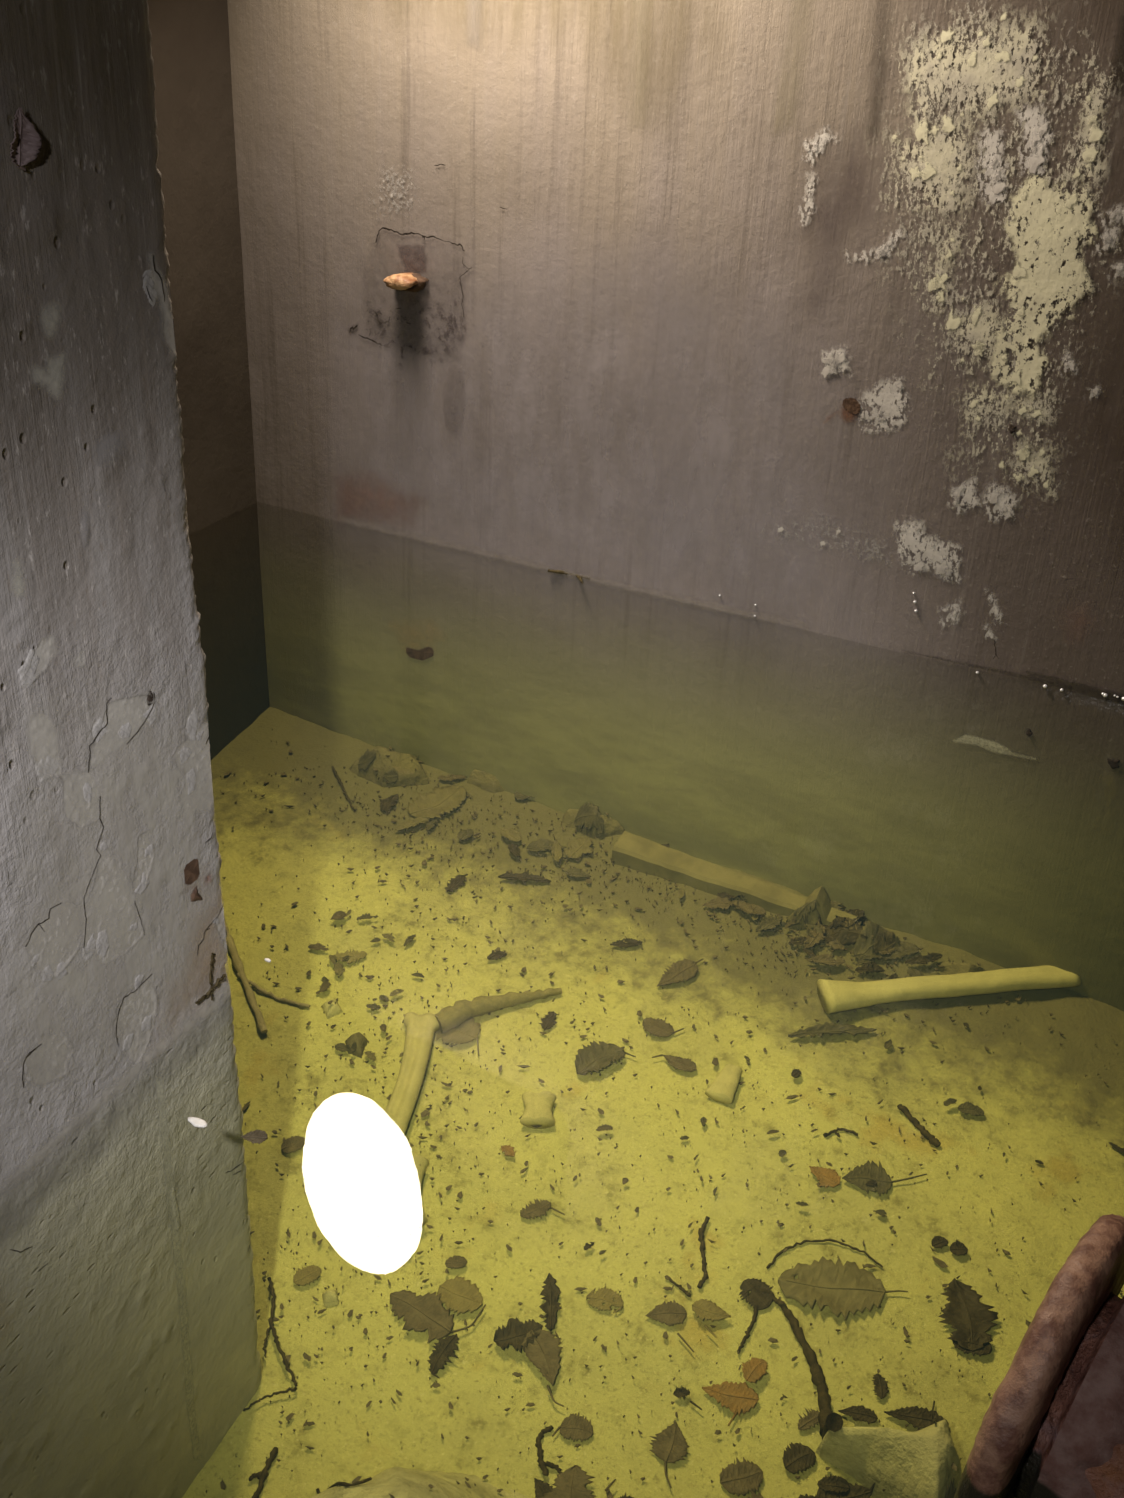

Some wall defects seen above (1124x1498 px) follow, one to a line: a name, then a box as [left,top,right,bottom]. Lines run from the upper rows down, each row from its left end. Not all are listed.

peeling [778,518,961,583]
peeling [940,604,960,627]
crack [25,698,154,948]